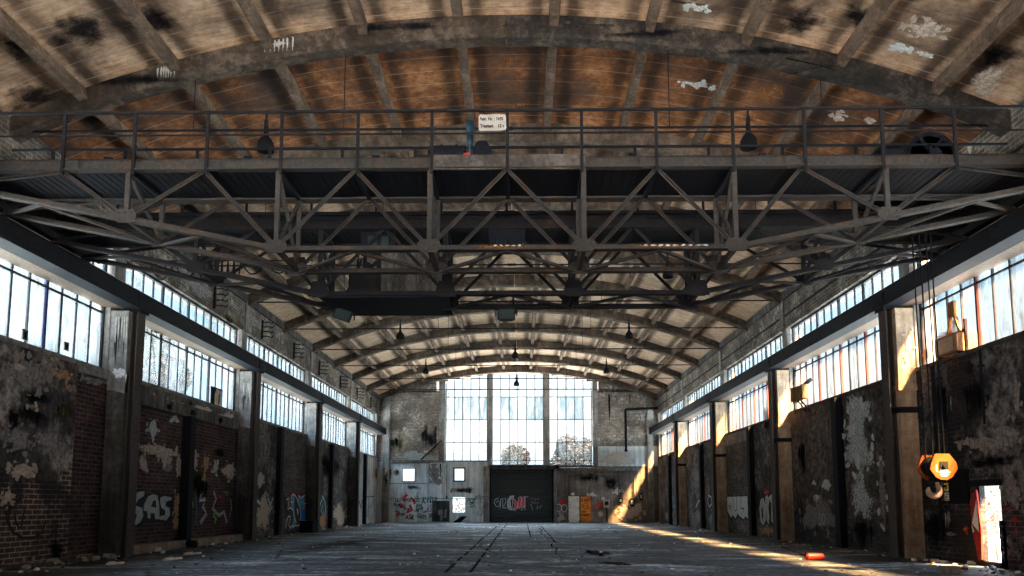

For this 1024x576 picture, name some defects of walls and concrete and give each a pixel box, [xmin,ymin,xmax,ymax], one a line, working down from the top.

peeling [888,15,951,58]
peeling [677,79,716,91]
peeling [970,65,1008,97]
peeling [828,110,848,122]
flaking render [1,350,127,412]
flaking render [953,376,1024,455]
flaking render [0,423,68,509]
peeling [138,443,181,493]
flaking render [842,393,888,531]
flaking render [799,479,836,539]